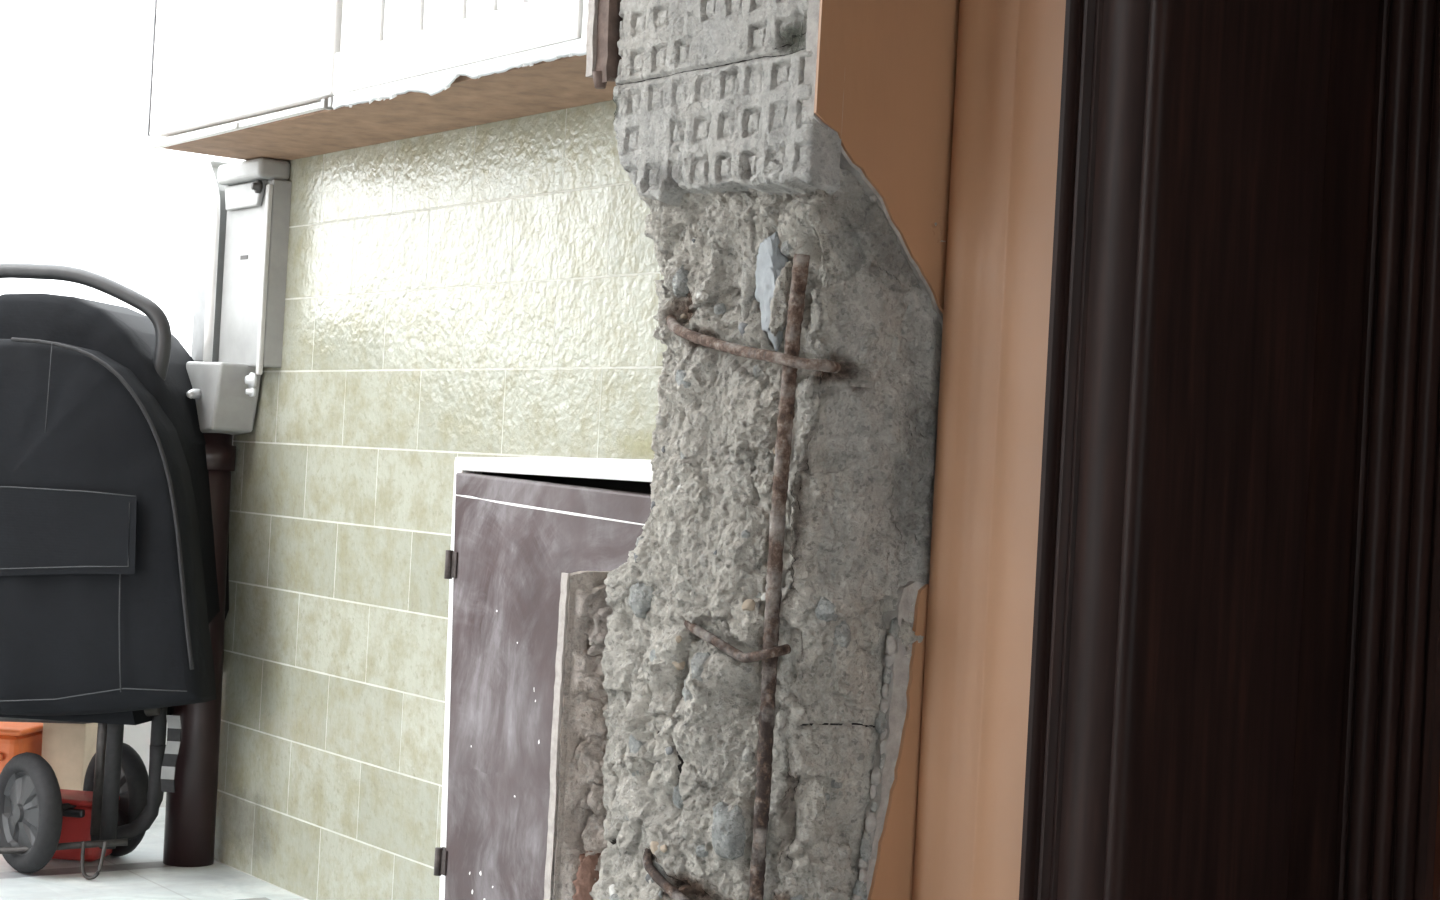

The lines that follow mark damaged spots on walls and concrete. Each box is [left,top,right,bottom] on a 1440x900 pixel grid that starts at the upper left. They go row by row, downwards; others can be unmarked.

corrosion [670,294,716,347]
corrosion [814,355,866,389]
spalling [589,168,942,900]
corrosion [653,854,717,900]